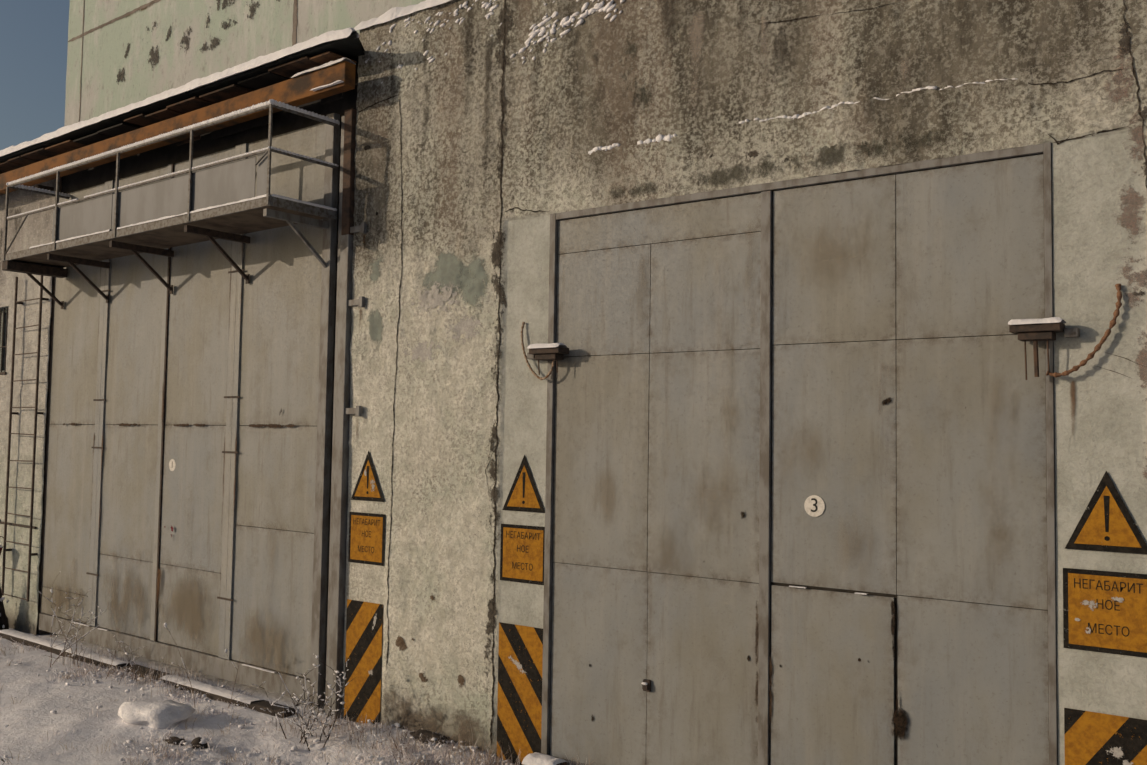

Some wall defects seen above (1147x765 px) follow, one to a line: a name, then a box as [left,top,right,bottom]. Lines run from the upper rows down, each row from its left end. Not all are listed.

peeling [116,44,130,82]
peeling [145,0,260,72]
damp [485,5,513,184]
damp [611,183,654,198]
damp [702,162,771,185]
damp [793,145,844,171]
crack [1025,0,1147,188]
damp [491,229,507,380]
crack [359,94,403,670]
crack [482,0,545,748]
damp [486,422,500,552]
damp [484,574,497,689]